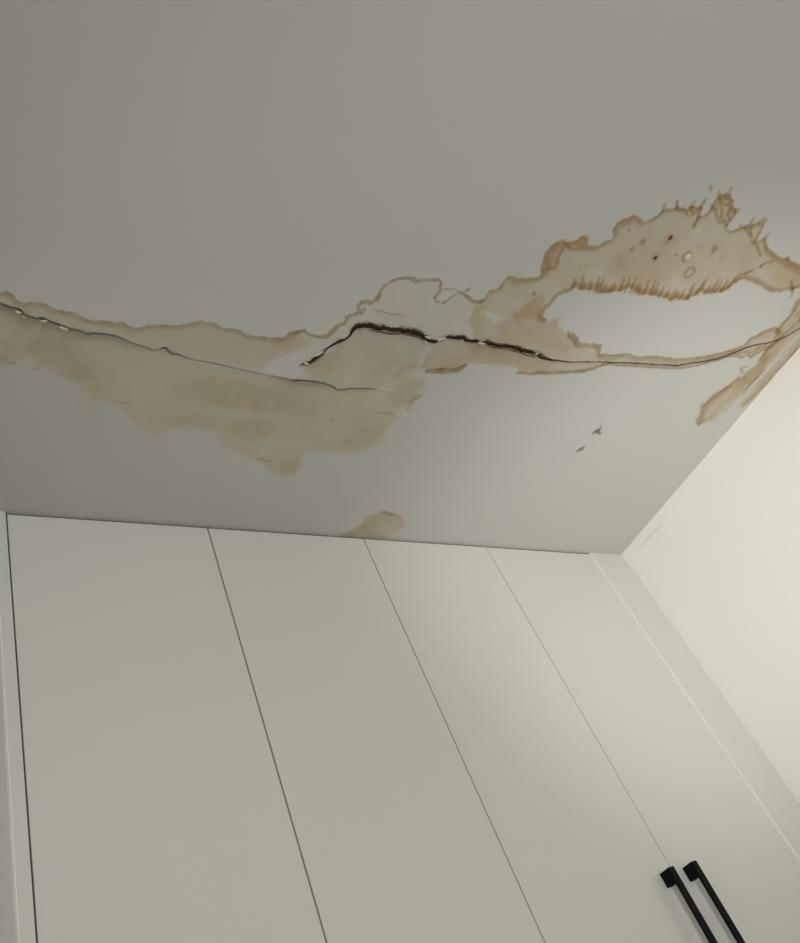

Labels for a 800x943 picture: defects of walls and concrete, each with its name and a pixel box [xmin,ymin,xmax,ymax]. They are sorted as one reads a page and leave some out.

crack [1,304,800,390]